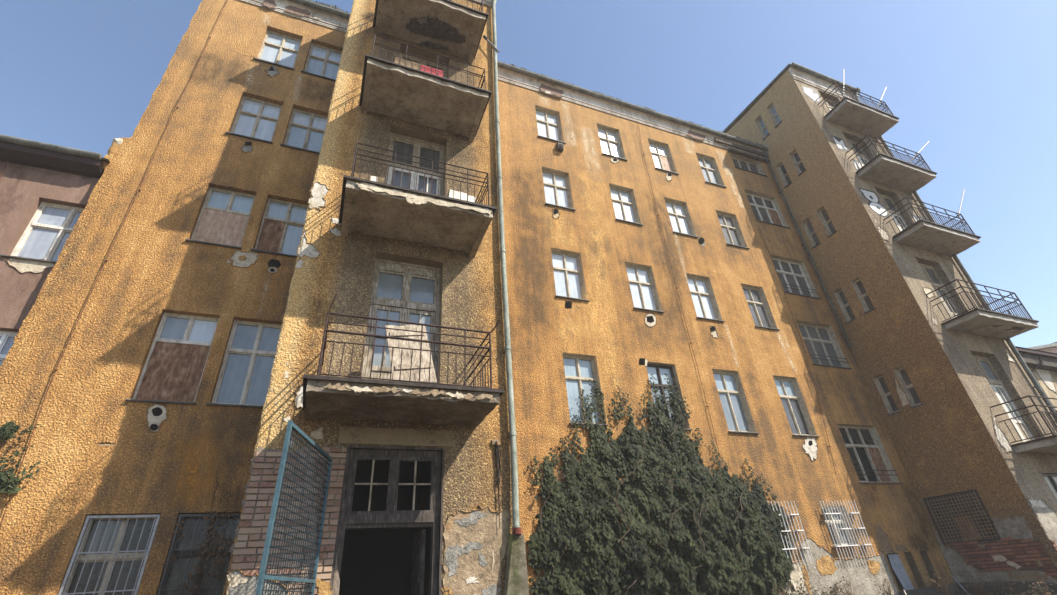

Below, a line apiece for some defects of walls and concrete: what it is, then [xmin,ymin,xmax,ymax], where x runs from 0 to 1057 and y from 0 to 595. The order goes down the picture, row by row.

peeling [307,181,342,236]
flaking render [4,256,55,274]
flaking render [227,250,281,274]
peeling [295,230,322,269]
peeling [284,385,306,423]
spalling [323,383,493,401]
flaking render [225,427,347,595]
flaking render [441,505,512,595]
flaking render [779,523,909,595]
flaking render [932,497,1057,584]